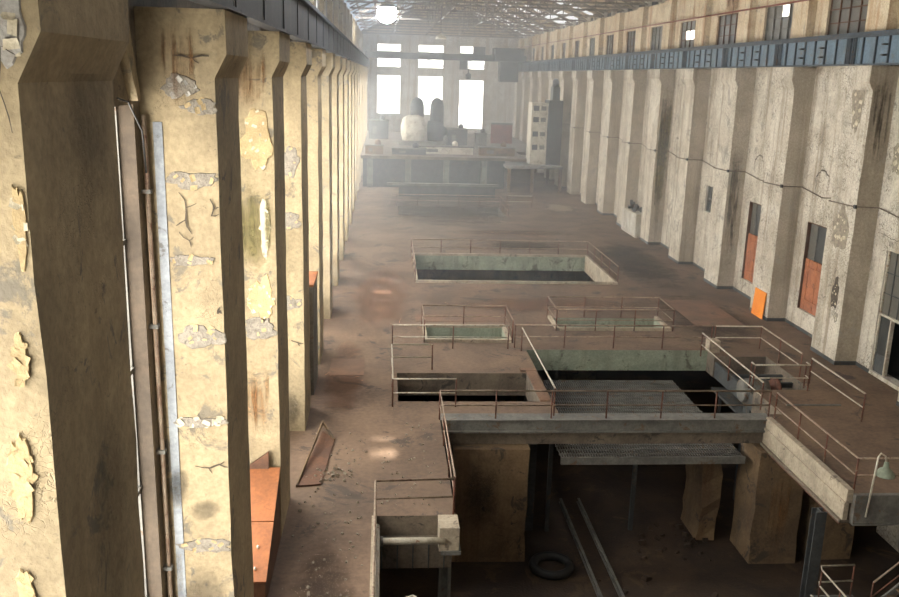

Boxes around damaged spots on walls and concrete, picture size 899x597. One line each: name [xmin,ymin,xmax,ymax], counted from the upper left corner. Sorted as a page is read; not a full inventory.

crack [172,54,209,63]
peeling [160,73,218,115]
peeling [240,108,300,178]
spalling [165,171,219,191]
crack [176,192,219,245]
damp [242,199,270,258]
spalling [178,324,227,349]
peeling [6,332,31,387]
spalling [173,416,229,428]
peeling [7,432,39,524]
peeling [15,568,37,597]